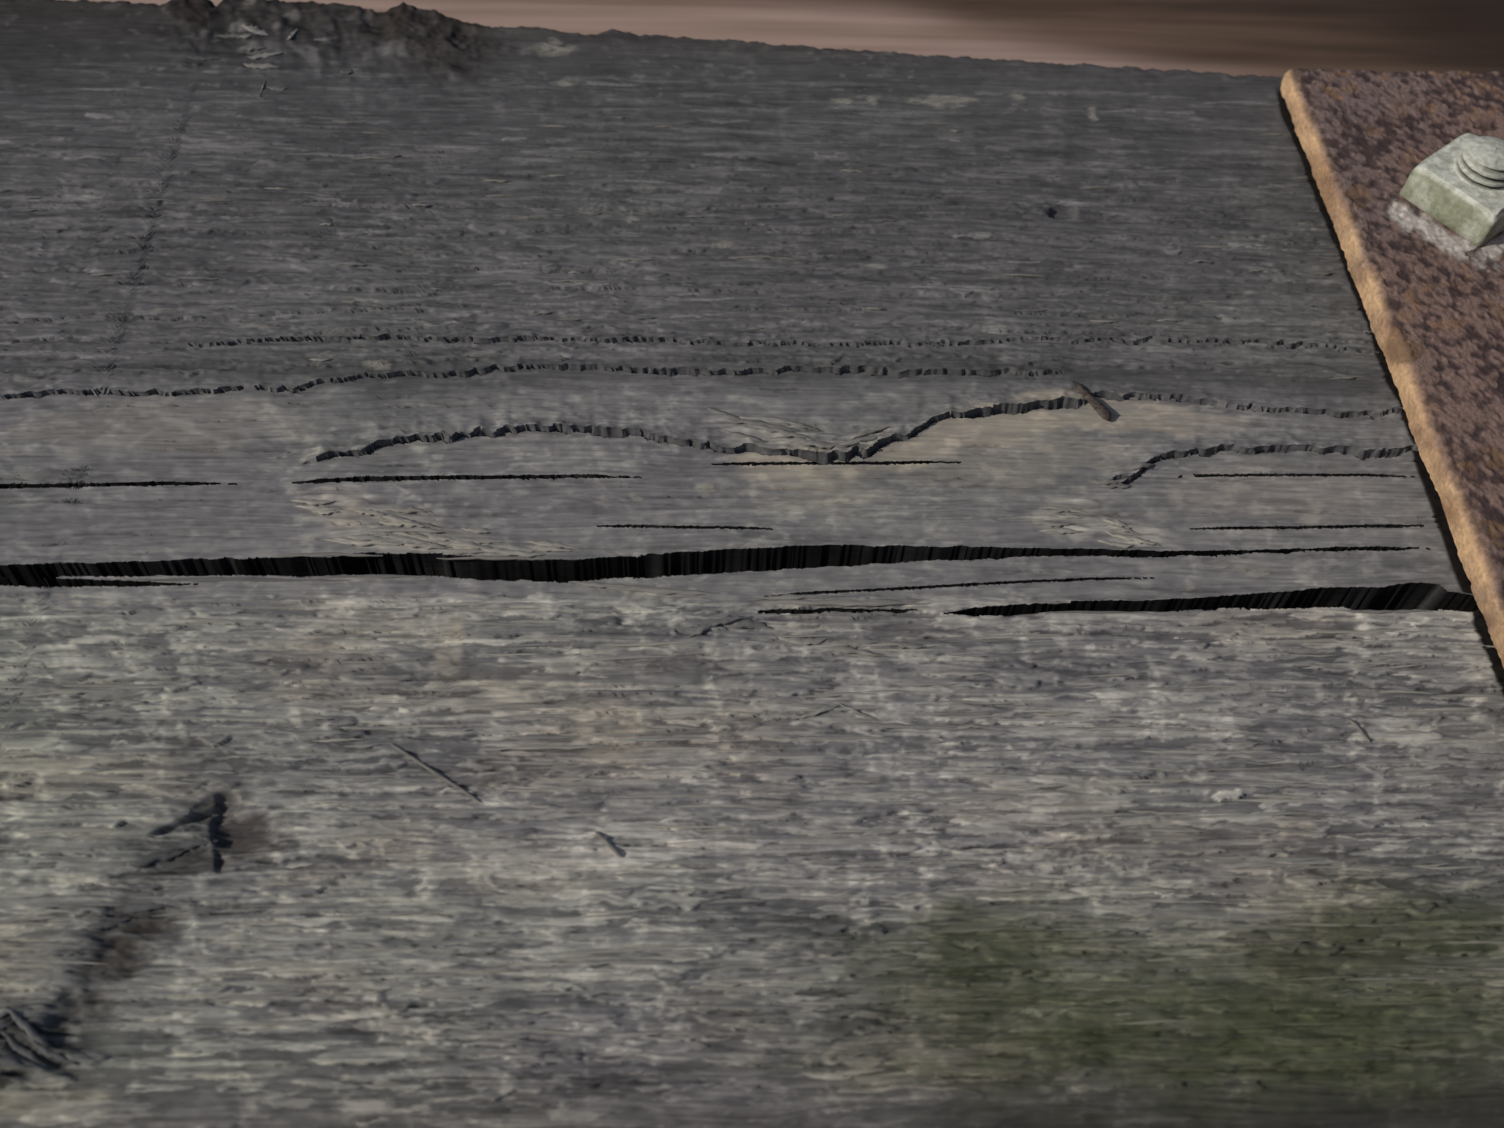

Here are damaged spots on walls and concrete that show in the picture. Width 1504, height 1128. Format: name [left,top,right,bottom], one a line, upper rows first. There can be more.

crack [0,480,238,490]
crack [0,333,1419,485]
rust [1277,91,1504,695]
crack [0,524,1479,617]